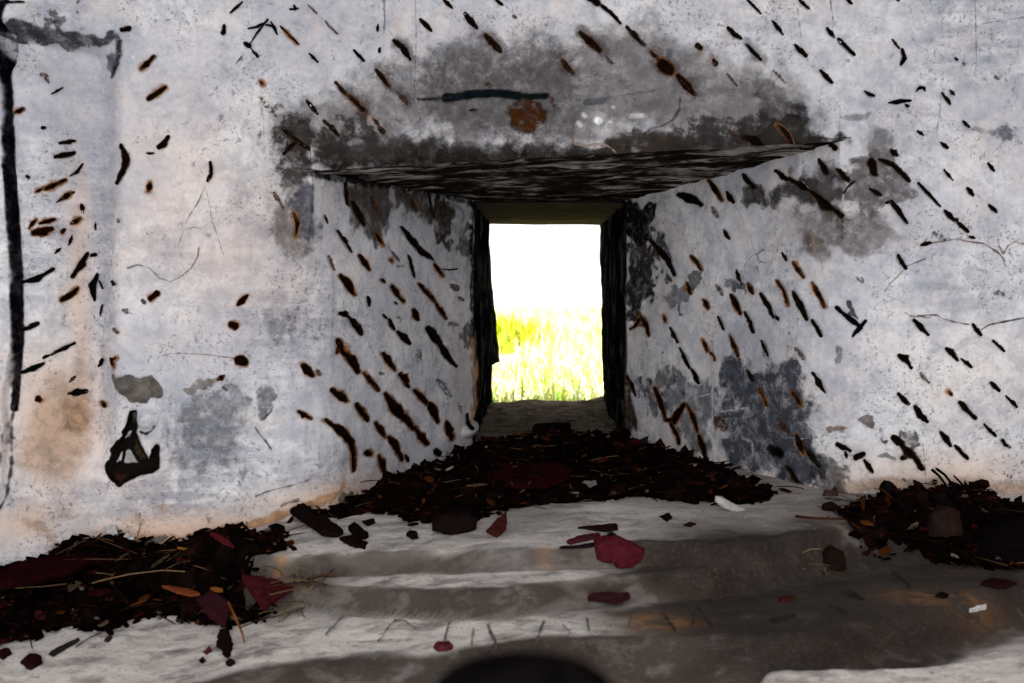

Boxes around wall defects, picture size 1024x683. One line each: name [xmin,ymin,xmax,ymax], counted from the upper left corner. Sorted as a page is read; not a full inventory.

corrosion [508,94,555,133]
damp [576,106,615,128]
crack [127,186,222,282]
crack [885,239,1024,291]
crack [906,313,1024,330]
spalling [97,356,163,487]
damp [634,351,967,493]
damp [986,482,1024,495]